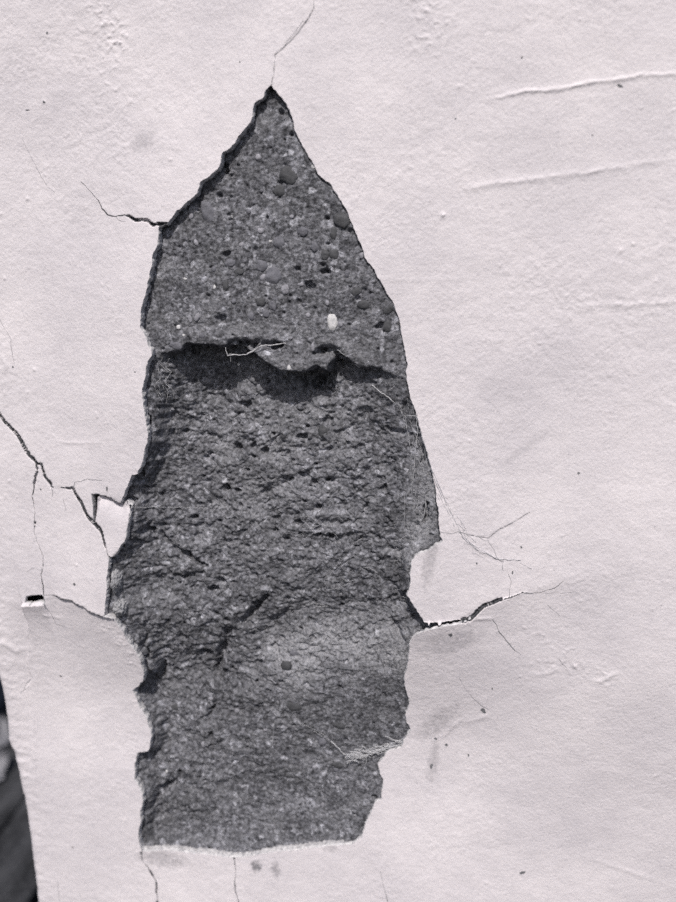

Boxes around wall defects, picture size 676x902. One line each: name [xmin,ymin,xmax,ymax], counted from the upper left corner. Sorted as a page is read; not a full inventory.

crack [81,182,167,227]
crack [0,414,108,628]
flaking render [91,85,471,858]
crack [442,523,569,654]